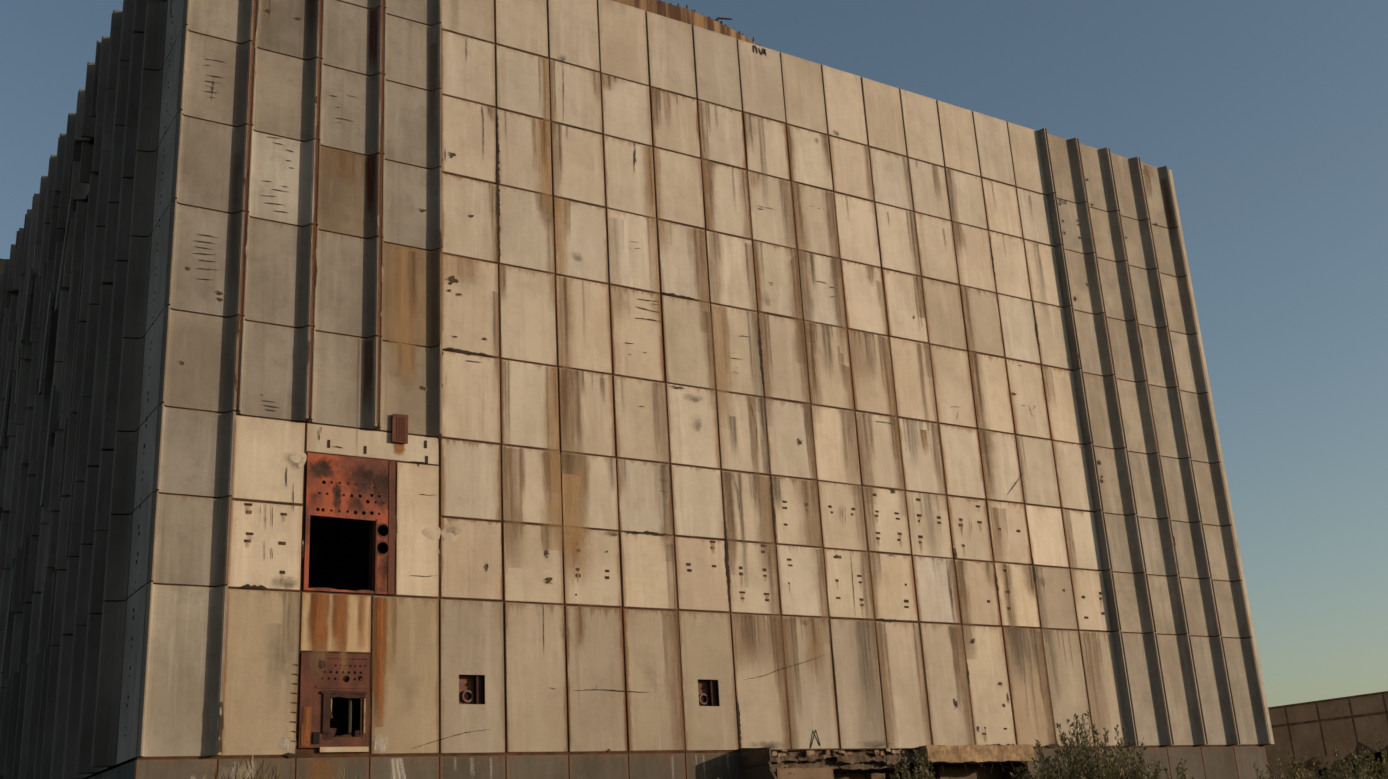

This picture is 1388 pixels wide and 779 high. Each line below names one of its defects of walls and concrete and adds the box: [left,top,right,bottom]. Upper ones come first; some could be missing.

rust [365,0,384,423]
rust [311,593,347,652]
rust [301,707,311,747]